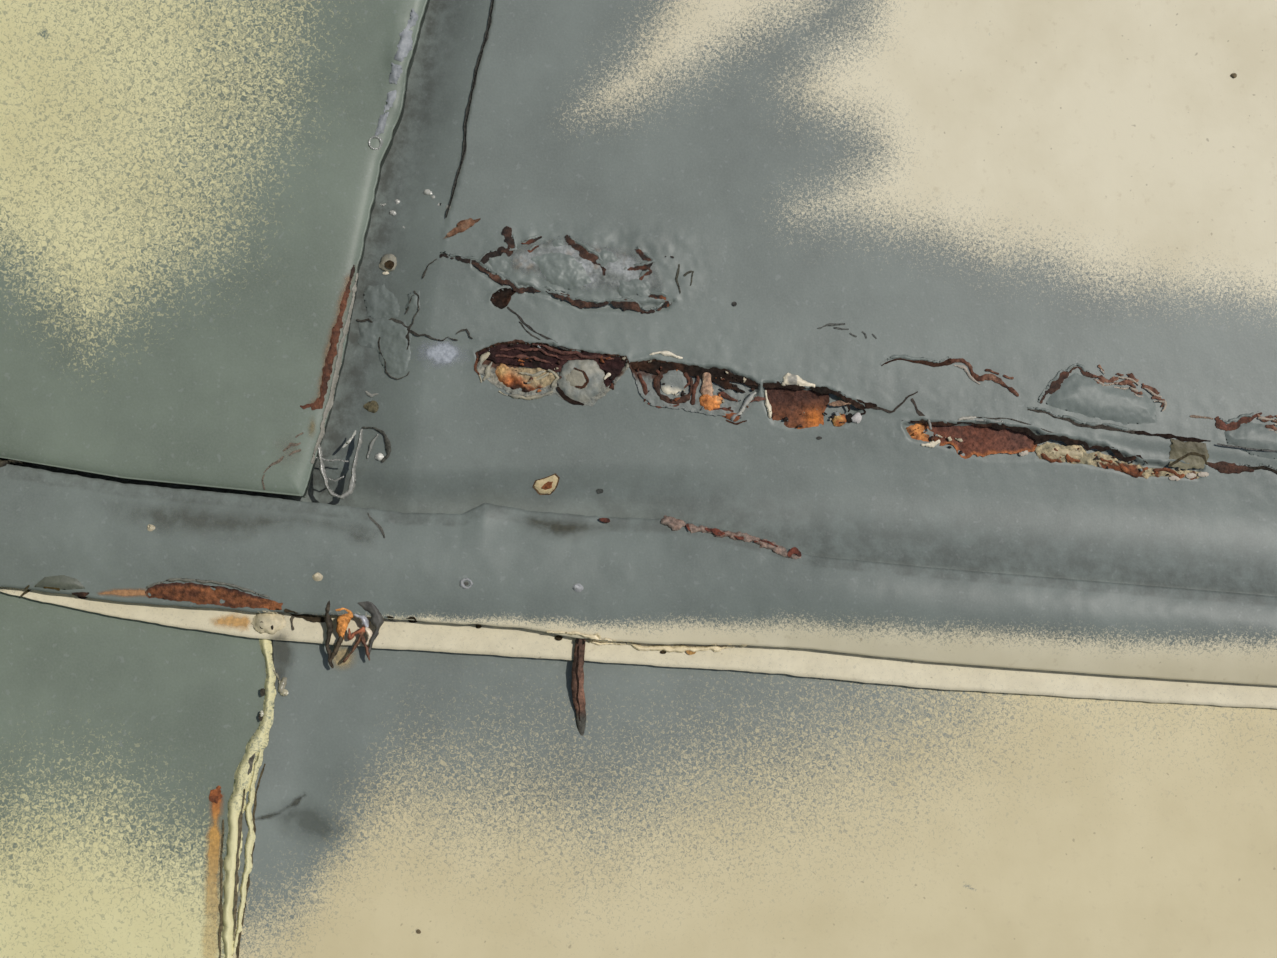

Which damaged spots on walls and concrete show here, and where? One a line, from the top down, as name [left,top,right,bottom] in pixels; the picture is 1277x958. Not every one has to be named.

crack [445,0,494,218]
corrosion [300,264,358,464]
peeling [474,350,492,383]
peeling [715,371,756,421]
peeling [823,412,862,423]
peeling [913,431,963,454]
crack [880,355,1277,474]
corrosion [660,515,801,559]
corrosion [100,578,283,627]
peeling [324,600,384,668]
corrosion [571,638,586,736]
corrosion [207,785,222,897]